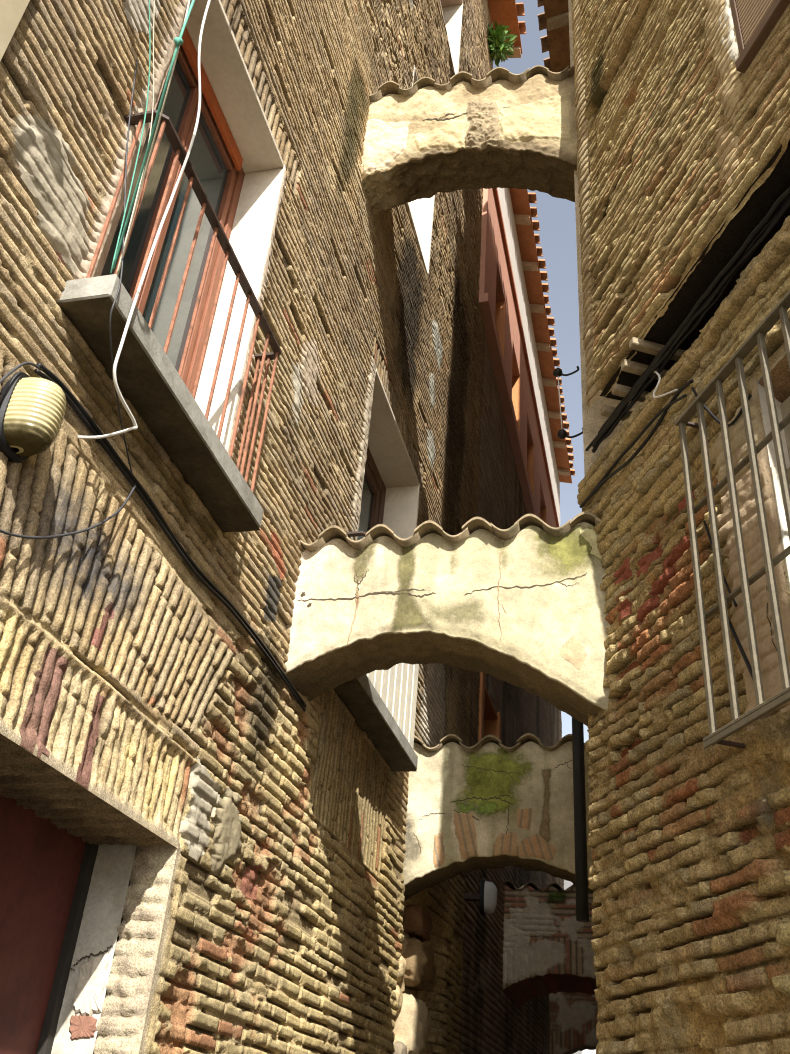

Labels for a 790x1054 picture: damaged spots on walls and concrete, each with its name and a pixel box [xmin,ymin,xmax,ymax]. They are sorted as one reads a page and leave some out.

crack [425,112,468,121]
crack [298,569,436,644]
crack [465,550,587,641]
spalling [433,812,478,868]
spalling [492,808,557,861]
crack [72,945,113,967]
peeling [69,952,109,1040]